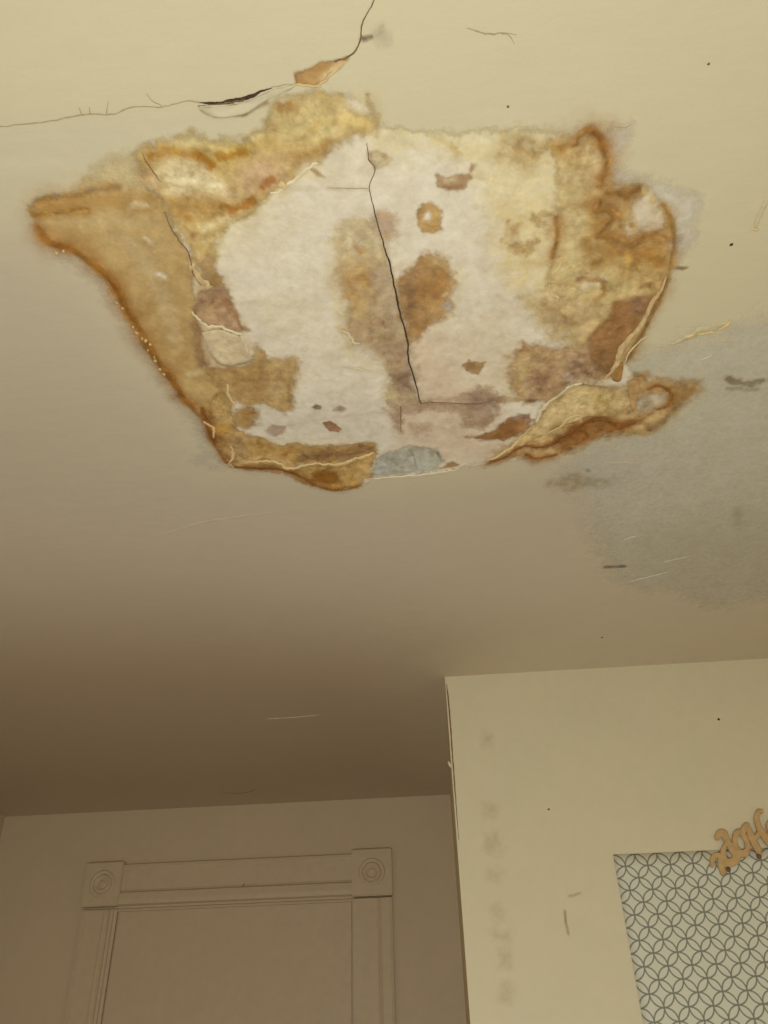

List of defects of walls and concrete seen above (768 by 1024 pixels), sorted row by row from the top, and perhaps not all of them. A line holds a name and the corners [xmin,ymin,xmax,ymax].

crack [0,83,295,127]
crack [335,0,375,62]
water stain [29,91,379,491]
peeling [132,58,678,489]
crack [331,144,494,428]
water stain [336,125,701,464]
water stain [725,376,764,387]